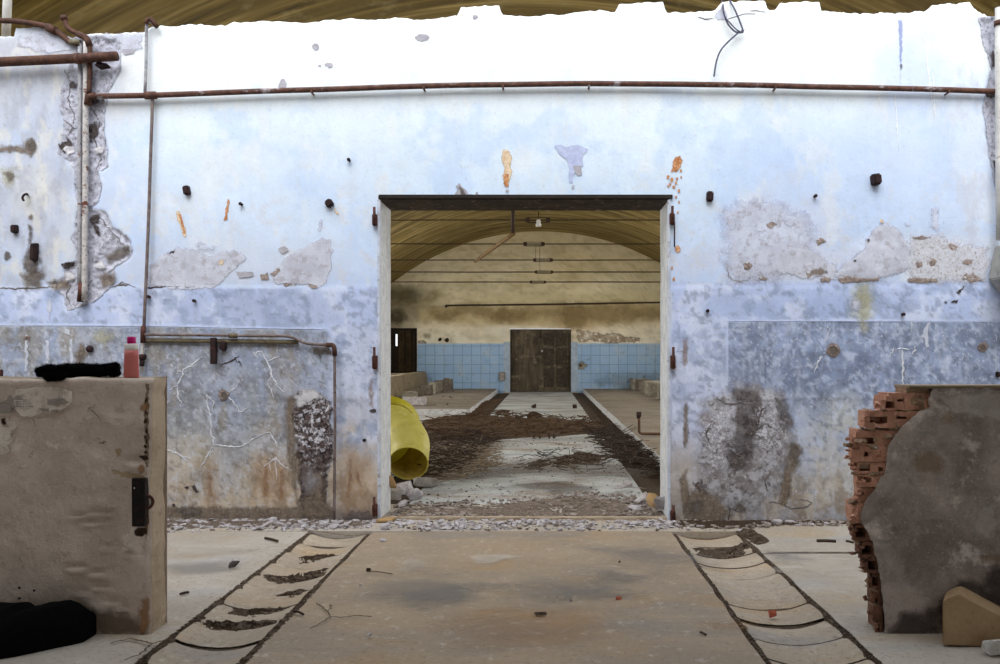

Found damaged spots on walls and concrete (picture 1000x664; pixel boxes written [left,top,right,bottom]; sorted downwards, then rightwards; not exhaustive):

flaking render [17,33,142,310]
rust [501,149,512,193]
peeling [555,145,588,189]
rust [667,156,683,213]
flaking render [148,237,334,290]
flaking render [775,238,881,283]
flaking render [907,233,990,284]
flaking render [576,330,640,343]
crack [167,351,293,480]
leakage [167,388,372,521]
leakage [686,479,746,520]
leakage [781,443,801,505]